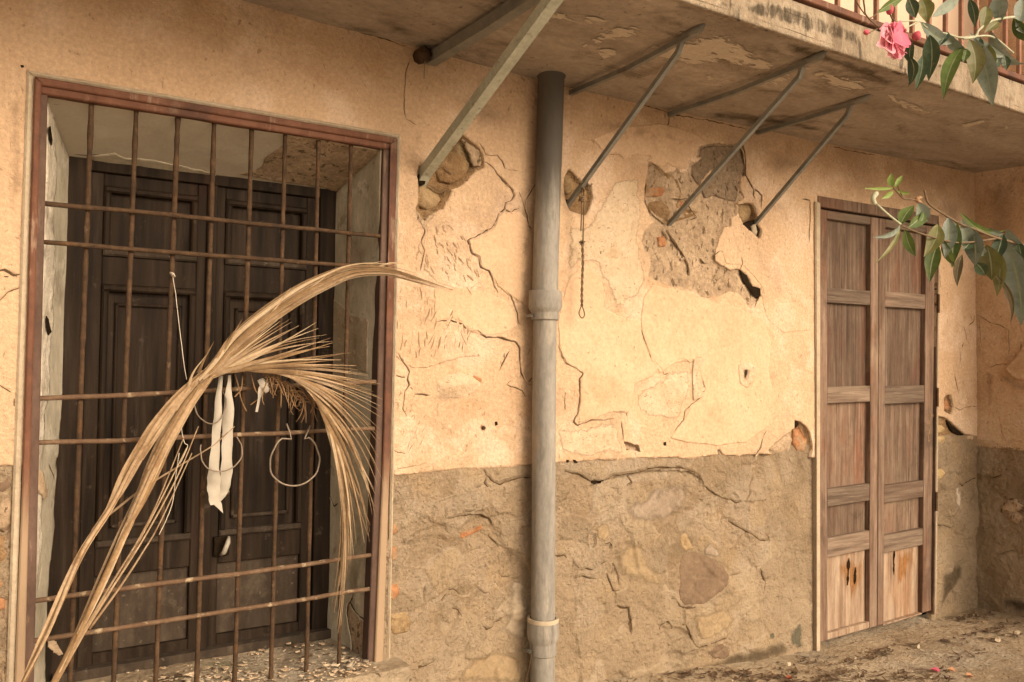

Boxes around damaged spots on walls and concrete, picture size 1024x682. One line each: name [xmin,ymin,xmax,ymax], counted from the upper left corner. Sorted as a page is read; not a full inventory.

crack [418,225,427,271]
flaking render [396,135,533,368]
crack [437,141,535,397]
flaking render [558,123,810,456]
crack [395,352,414,416]
crack [558,345,628,440]
crack [641,328,706,432]
flaking render [768,420,812,461]
flaking render [928,395,973,443]
flaking render [629,486,686,520]
crack [565,464,770,541]
flaking render [679,533,729,605]